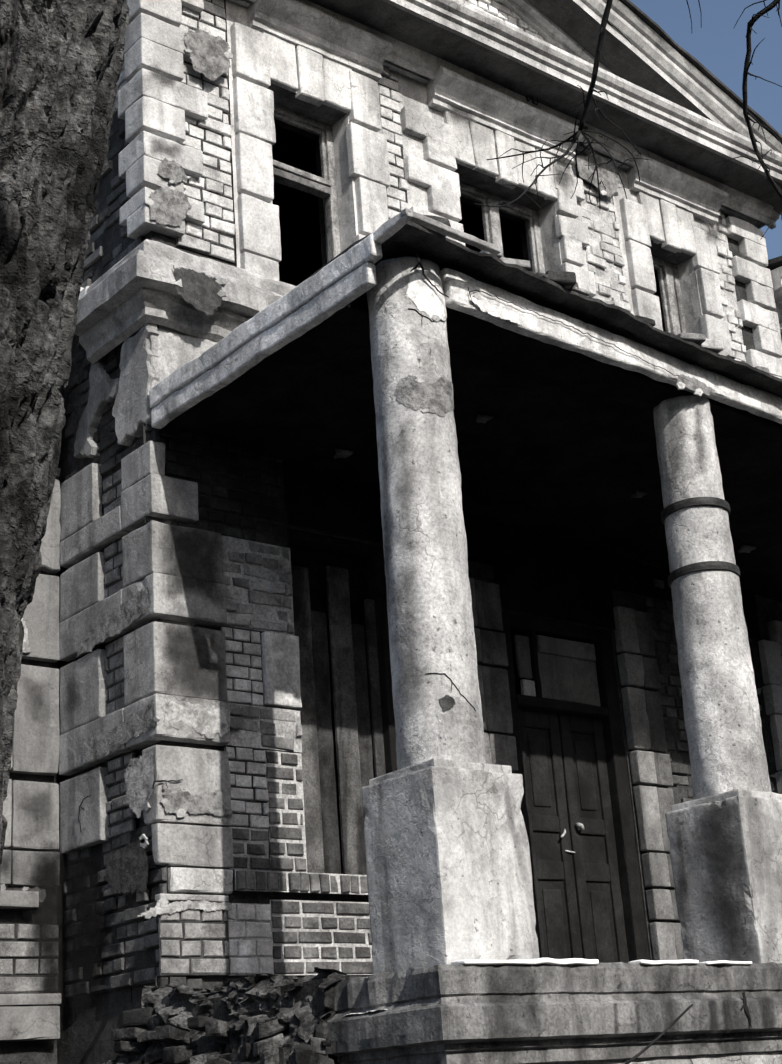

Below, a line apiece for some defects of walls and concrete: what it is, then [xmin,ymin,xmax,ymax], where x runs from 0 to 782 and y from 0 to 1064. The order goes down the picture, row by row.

spalling [183,28,233,81]
spalling [173,265,226,317]
crack [408,254,689,381]
spalling [394,375,454,417]
leakage [166,523,222,602]
leakage [167,625,223,697]
crack [425,673,476,711]
spalling [82,700,229,763]
spalling [124,747,234,818]
spalling [105,834,149,894]
peeling [139,898,232,919]
spalling [111,978,342,1064]